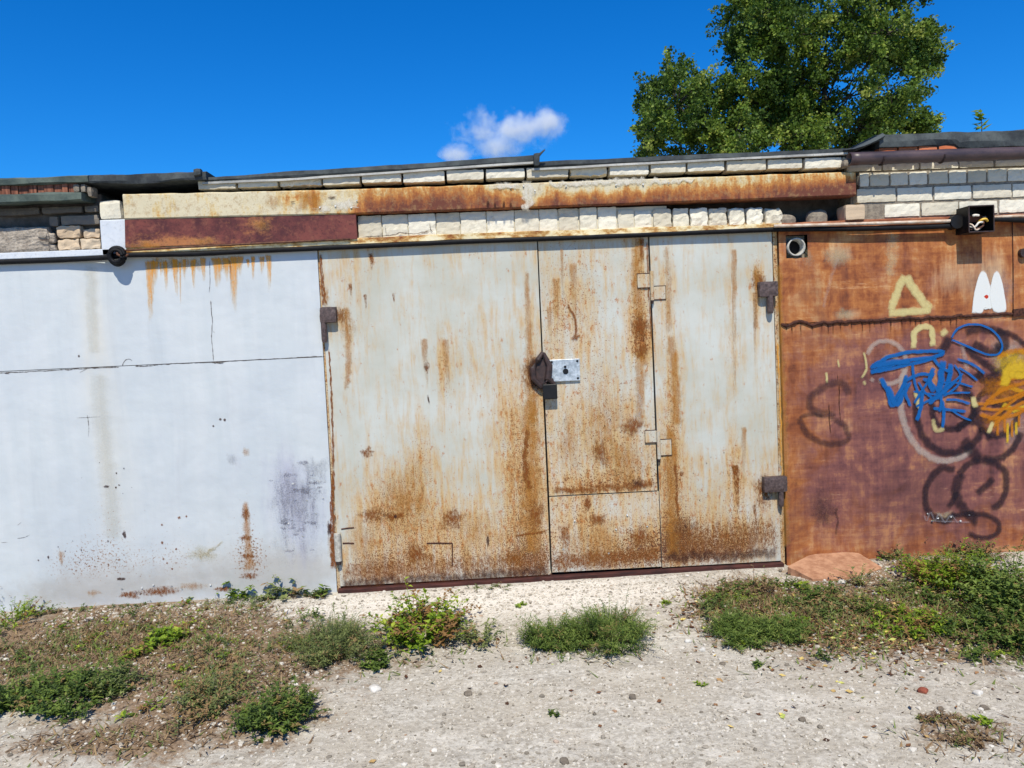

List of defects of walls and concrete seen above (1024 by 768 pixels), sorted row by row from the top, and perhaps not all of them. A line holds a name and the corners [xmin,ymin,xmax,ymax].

corrosion [145,244,271,304]
corrosion [337,309,351,382]
corrosion [621,238,652,437]
corrosion [777,275,957,475]
corrosion [328,323,548,588]
corrosion [554,480,654,494]
corrosion [593,412,633,465]
corrosion [666,339,787,562]
corrosion [241,505,257,579]